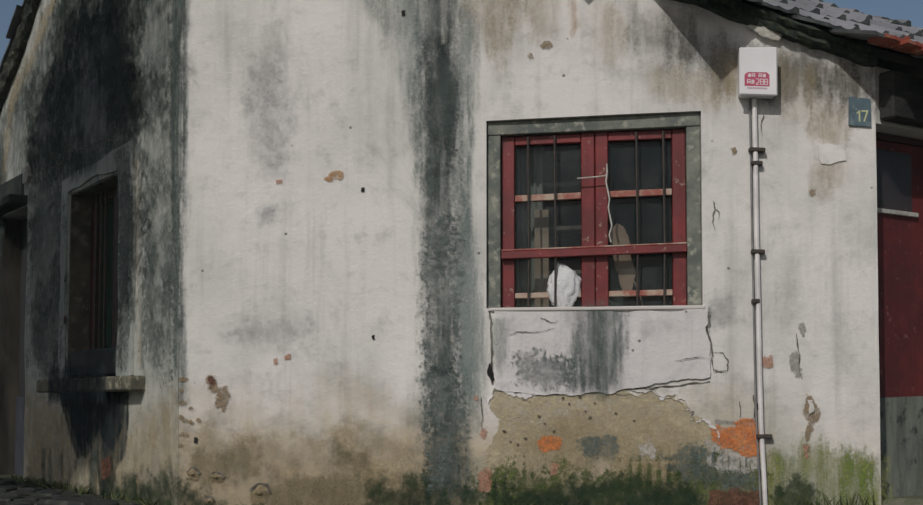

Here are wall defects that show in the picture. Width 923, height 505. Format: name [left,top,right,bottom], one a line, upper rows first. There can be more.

spalling [324,171,343,182]
damp [2,0,187,500]
damp [267,0,483,505]
flaking render [205,375,230,412]
crack [474,308,729,439]
flaking render [478,388,761,496]
flaking render [707,487,763,505]
flaking render [803,396,820,459]